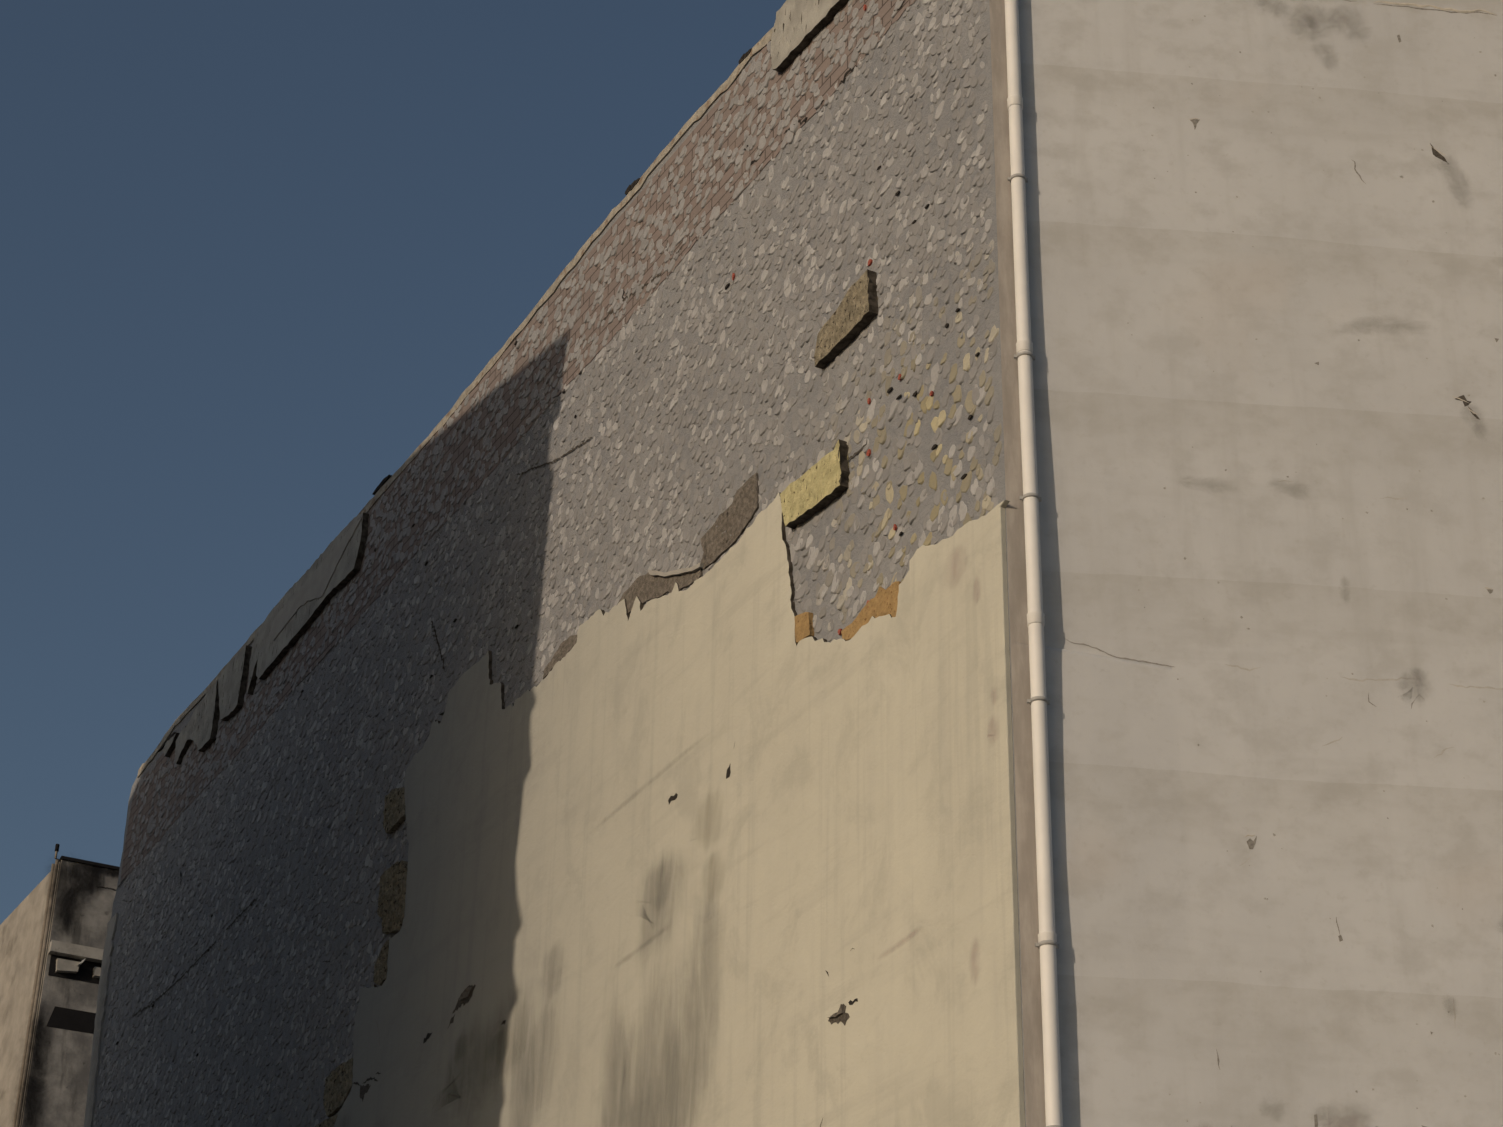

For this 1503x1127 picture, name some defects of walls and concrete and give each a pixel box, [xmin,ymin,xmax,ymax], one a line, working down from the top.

peeling [93,0,1002,1127]
crack [1345,0,1503,16]